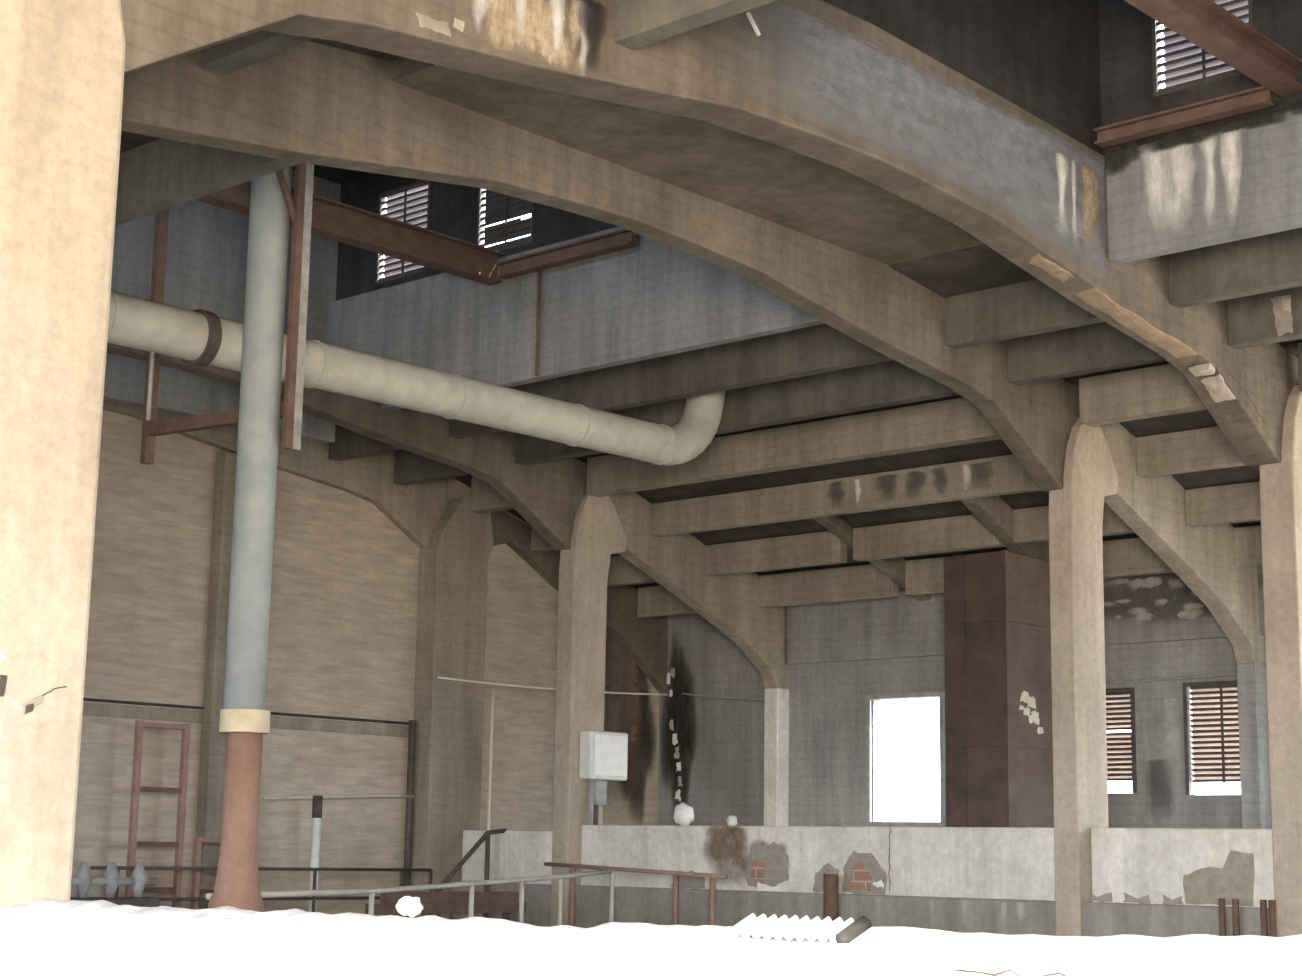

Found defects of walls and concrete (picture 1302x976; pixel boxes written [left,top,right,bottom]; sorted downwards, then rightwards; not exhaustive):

damp [1146,130,1239,213]
spalling [22,695,43,715]
peeling [745,842,789,892]
peeling [813,851,888,895]
peeling [1091,850,1255,907]